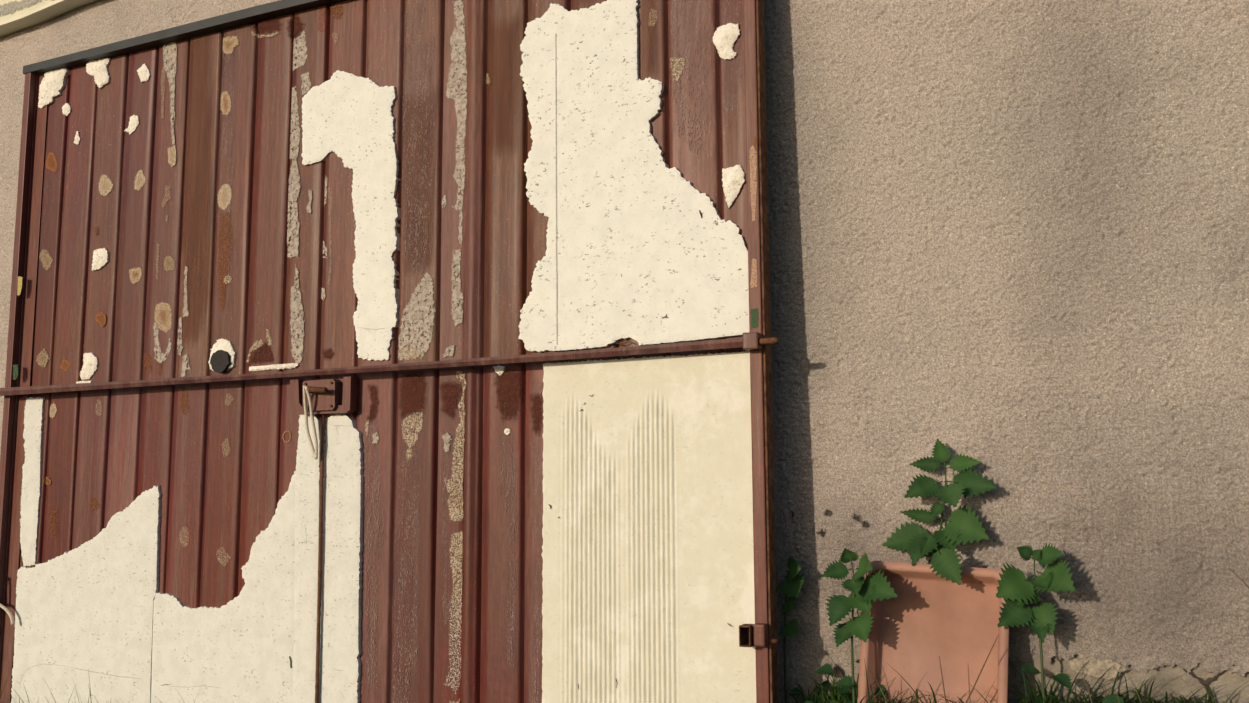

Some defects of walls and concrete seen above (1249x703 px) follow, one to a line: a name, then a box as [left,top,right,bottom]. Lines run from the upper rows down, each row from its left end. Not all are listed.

peeling [153,267,190,377]
peeling [287,31,332,364]
peeling [364,0,467,703]
flaking render [1067,656,1129,680]